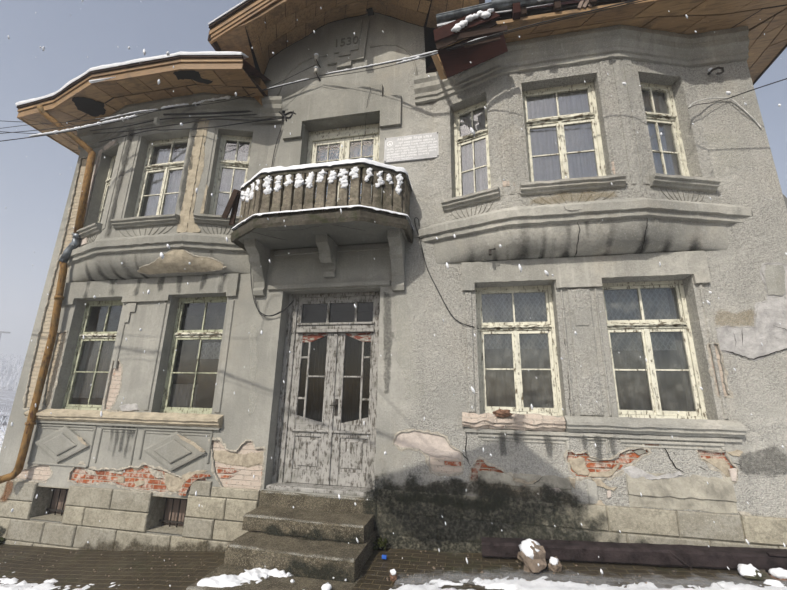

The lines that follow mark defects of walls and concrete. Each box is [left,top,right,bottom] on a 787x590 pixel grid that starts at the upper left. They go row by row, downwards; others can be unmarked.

spalling [67,434,266,496]
spalling [392,428,513,482]
leakage [500,433,519,454]
leakage [582,436,615,461]
spalling [563,440,683,506]
spalling [696,447,743,484]
leakage [740,447,787,475]
leakage [363,474,605,553]